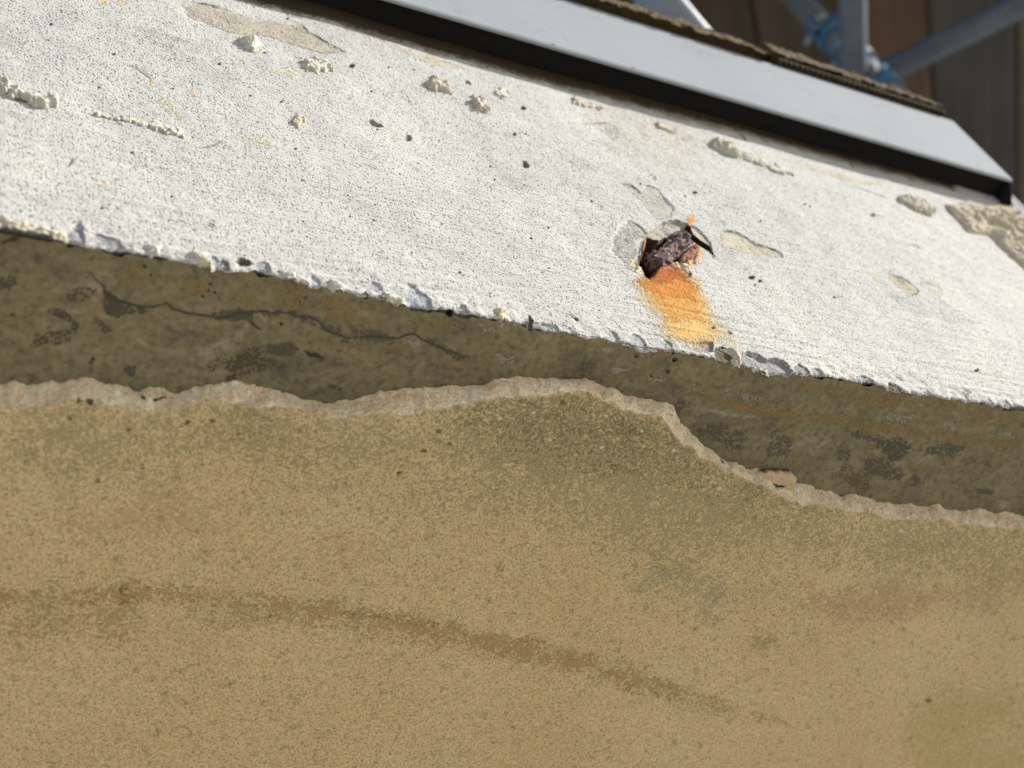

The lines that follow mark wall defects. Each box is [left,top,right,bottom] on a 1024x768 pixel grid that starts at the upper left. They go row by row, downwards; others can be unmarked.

peeling [66,219,124,251]
peeling [611,184,780,278]
peeling [209,255,270,274]
crack [90,272,469,360]
peeling [405,284,432,309]
peeling [446,304,468,318]
peeling [527,314,559,332]
peeling [608,329,649,358]
rust [627,244,757,356]
peeling [690,326,822,377]
spalling [0,376,1024,529]
water stain [0,571,790,726]